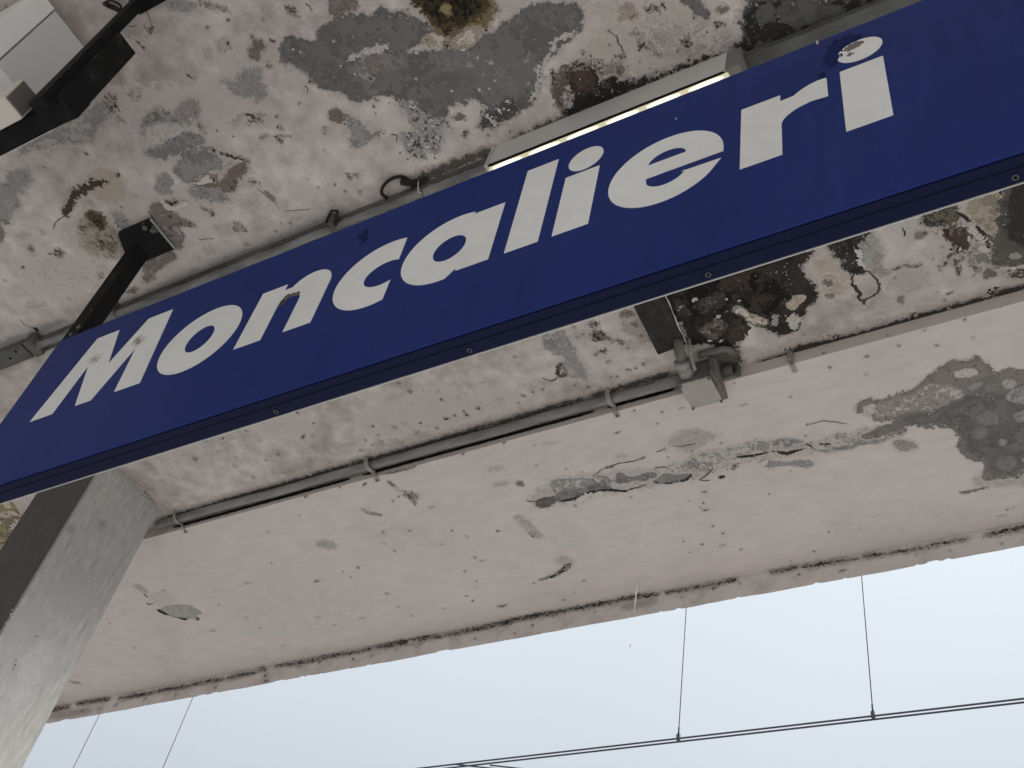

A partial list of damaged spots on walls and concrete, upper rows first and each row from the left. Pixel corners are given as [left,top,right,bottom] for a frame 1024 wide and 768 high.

peeling [264,0,630,163]
damp [555,0,875,116]
damp [0,159,108,311]
damp [82,162,239,297]
peeling [135,96,251,286]
peeling [771,294,806,330]
peeling [854,249,866,270]
crack [850,271,881,305]
peeling [958,224,1024,281]
peeling [524,354,1024,511]
damp [221,573,381,644]
damp [49,707,92,721]